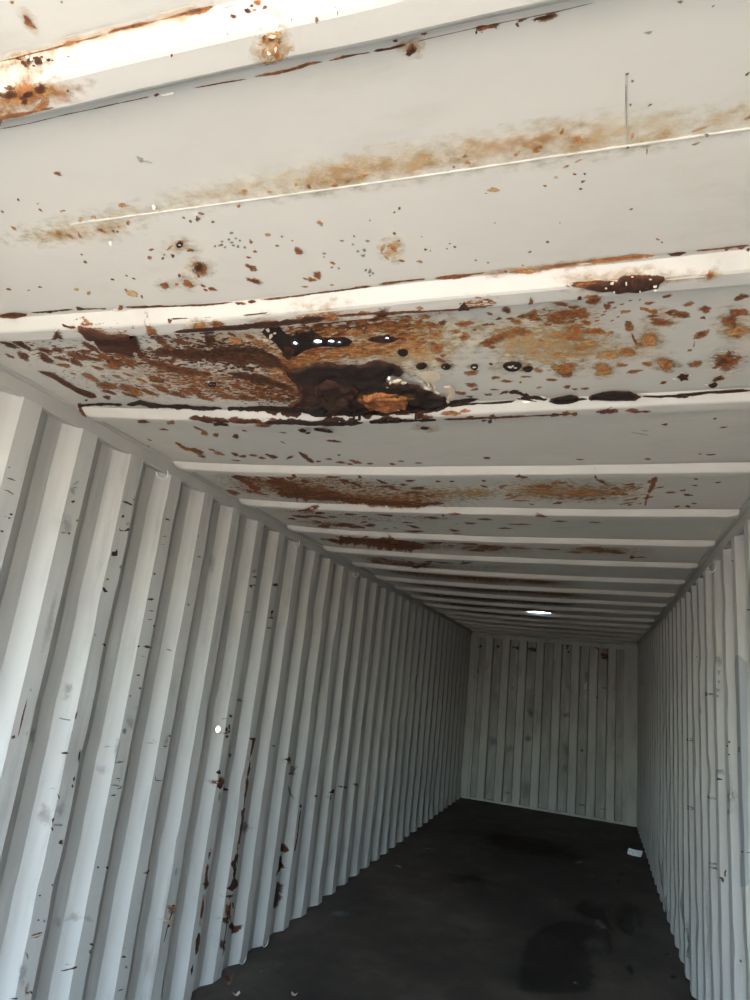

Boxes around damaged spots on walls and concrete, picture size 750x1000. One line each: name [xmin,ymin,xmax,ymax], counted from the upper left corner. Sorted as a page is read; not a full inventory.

corrosion [258,32,291,65]
corrosion [0,56,69,125]
corrosion [474,127,634,190]
corrosion [147,240,217,291]
corrosion [245,239,263,284]
corrosion [721,294,750,339]
corrosion [0,294,742,405]
peeling [416,371,455,403]
corrosion [175,440,698,631]
corrosion [219,738,256,950]
corrosion [273,843,289,908]
corrosion [191,849,213,975]